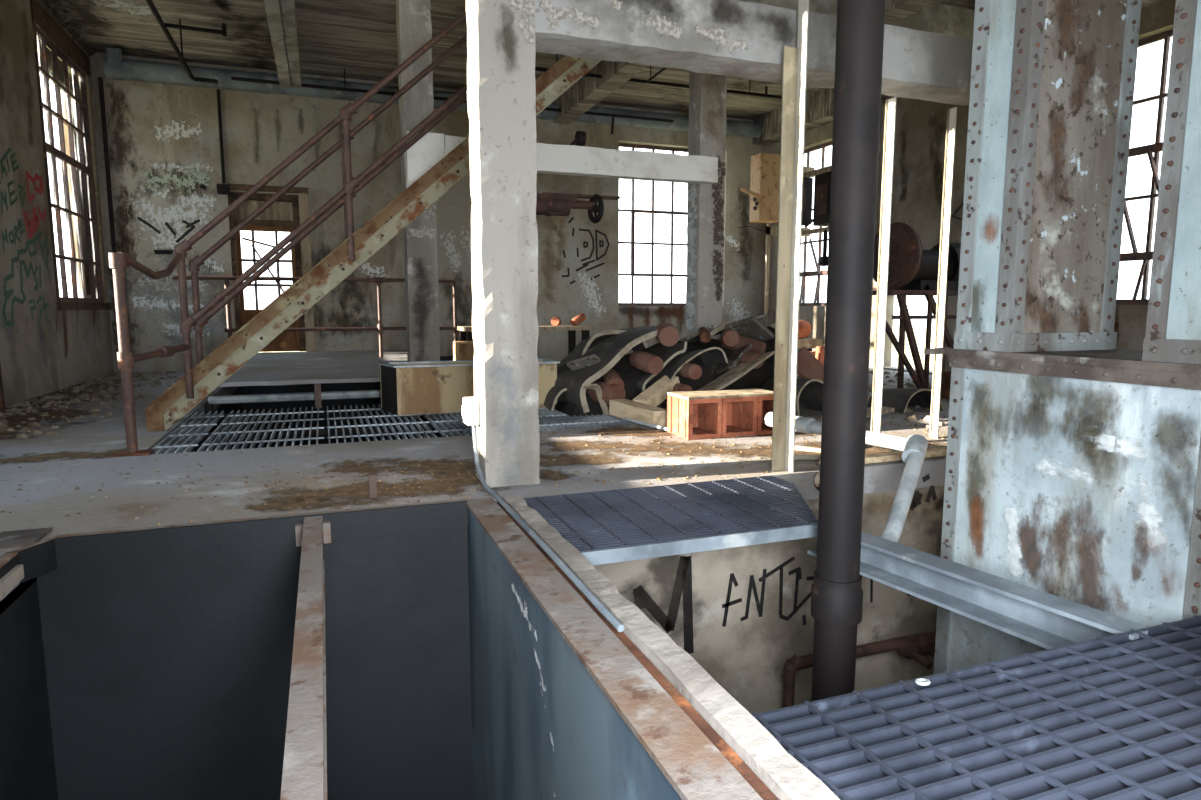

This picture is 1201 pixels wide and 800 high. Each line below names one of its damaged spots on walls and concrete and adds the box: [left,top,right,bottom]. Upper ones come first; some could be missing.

damp [64,0,191,62]
damp [502,24,514,62]
damp [637,0,673,13]
damp [714,0,741,20]
corrosion [1156,416,1192,523]
spalling [862,490,897,537]
spalling [898,485,945,557]
corrosion [971,499,983,555]
corrosion [1017,506,1108,610]
corrosion [1133,526,1147,579]
spalling [593,537,817,715]
spalling [855,576,938,691]